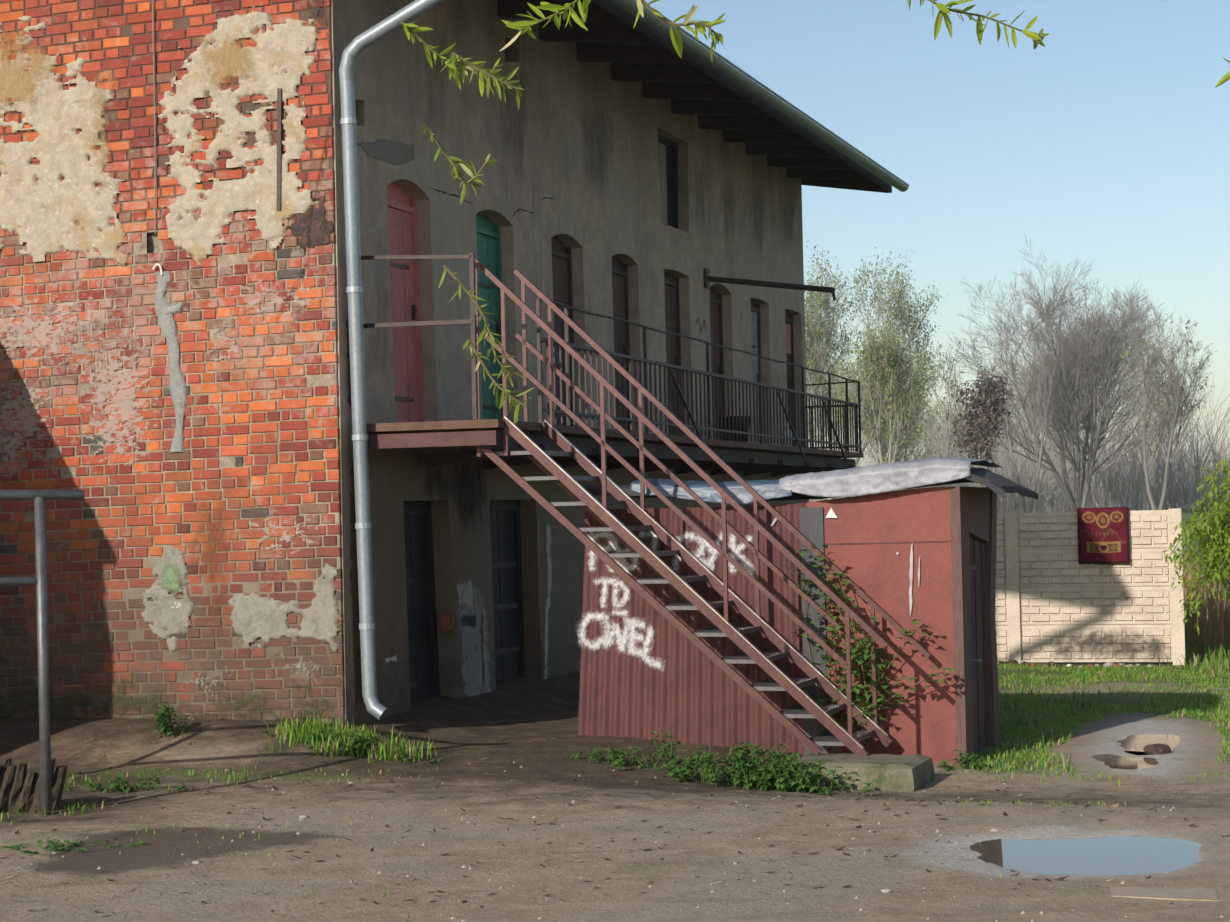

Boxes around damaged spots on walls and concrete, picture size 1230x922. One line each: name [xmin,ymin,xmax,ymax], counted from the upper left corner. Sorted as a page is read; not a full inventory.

flaking render [0,16,130,267]
flaking render [155,6,334,265]
crack [429,187,472,204]
peeling [166,636,178,654]
peeling [439,578,492,697]